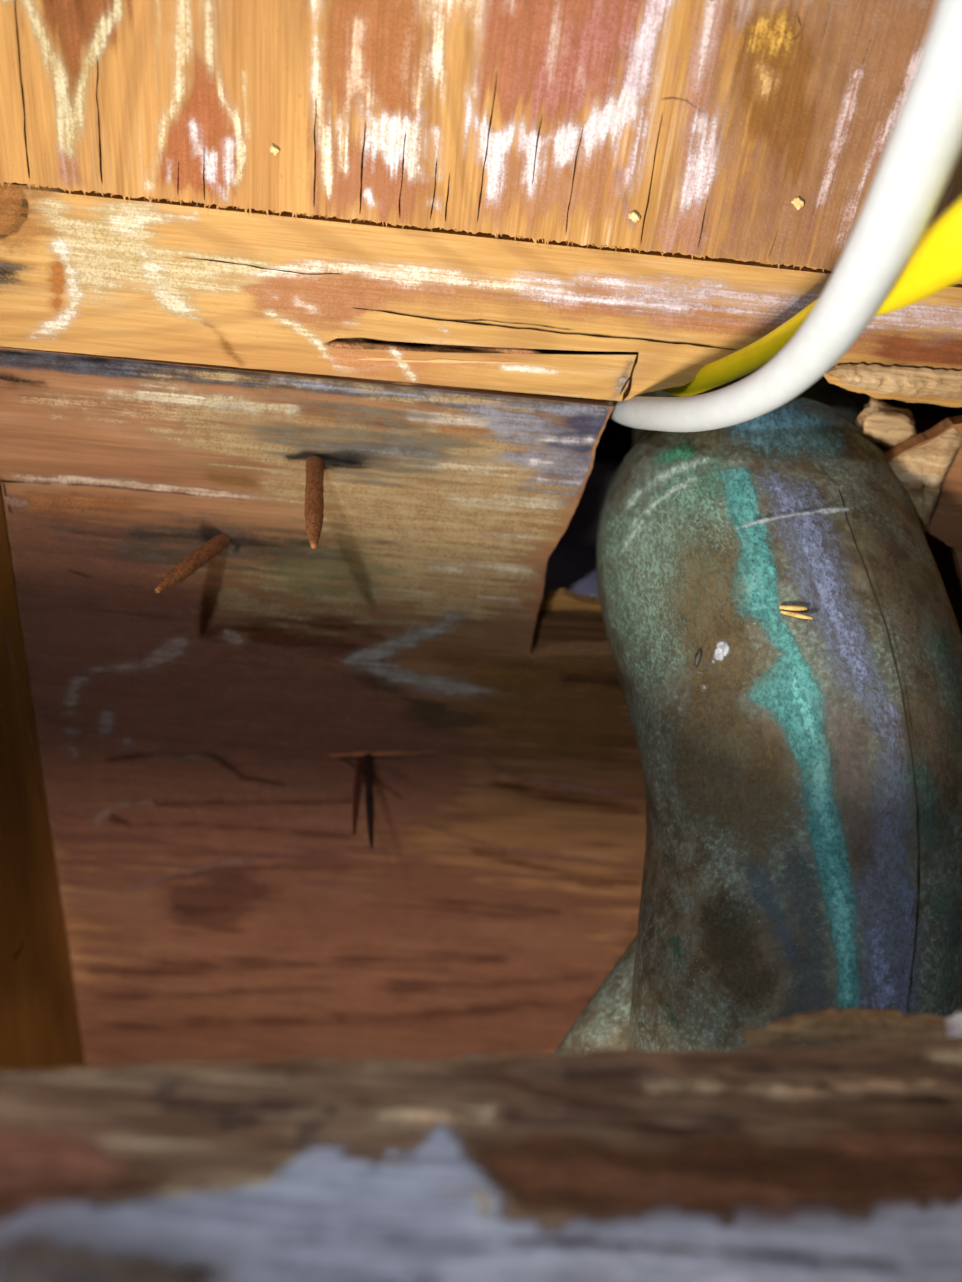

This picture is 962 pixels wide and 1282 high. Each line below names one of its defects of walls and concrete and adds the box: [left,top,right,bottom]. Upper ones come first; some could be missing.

crack [177,161,204,194]
water stain [144,0,248,197]
water stain [311,0,671,225]
crack [565,121,585,235]
crack [641,98,718,239]
water stain [661,0,938,270]
crack [184,257,335,275]
crack [355,308,736,401]
water stain [0,184,821,1078]
water stain [598,445,960,1018]
peeling [0,1127,962,1282]
water stain [472,1129,962,1222]